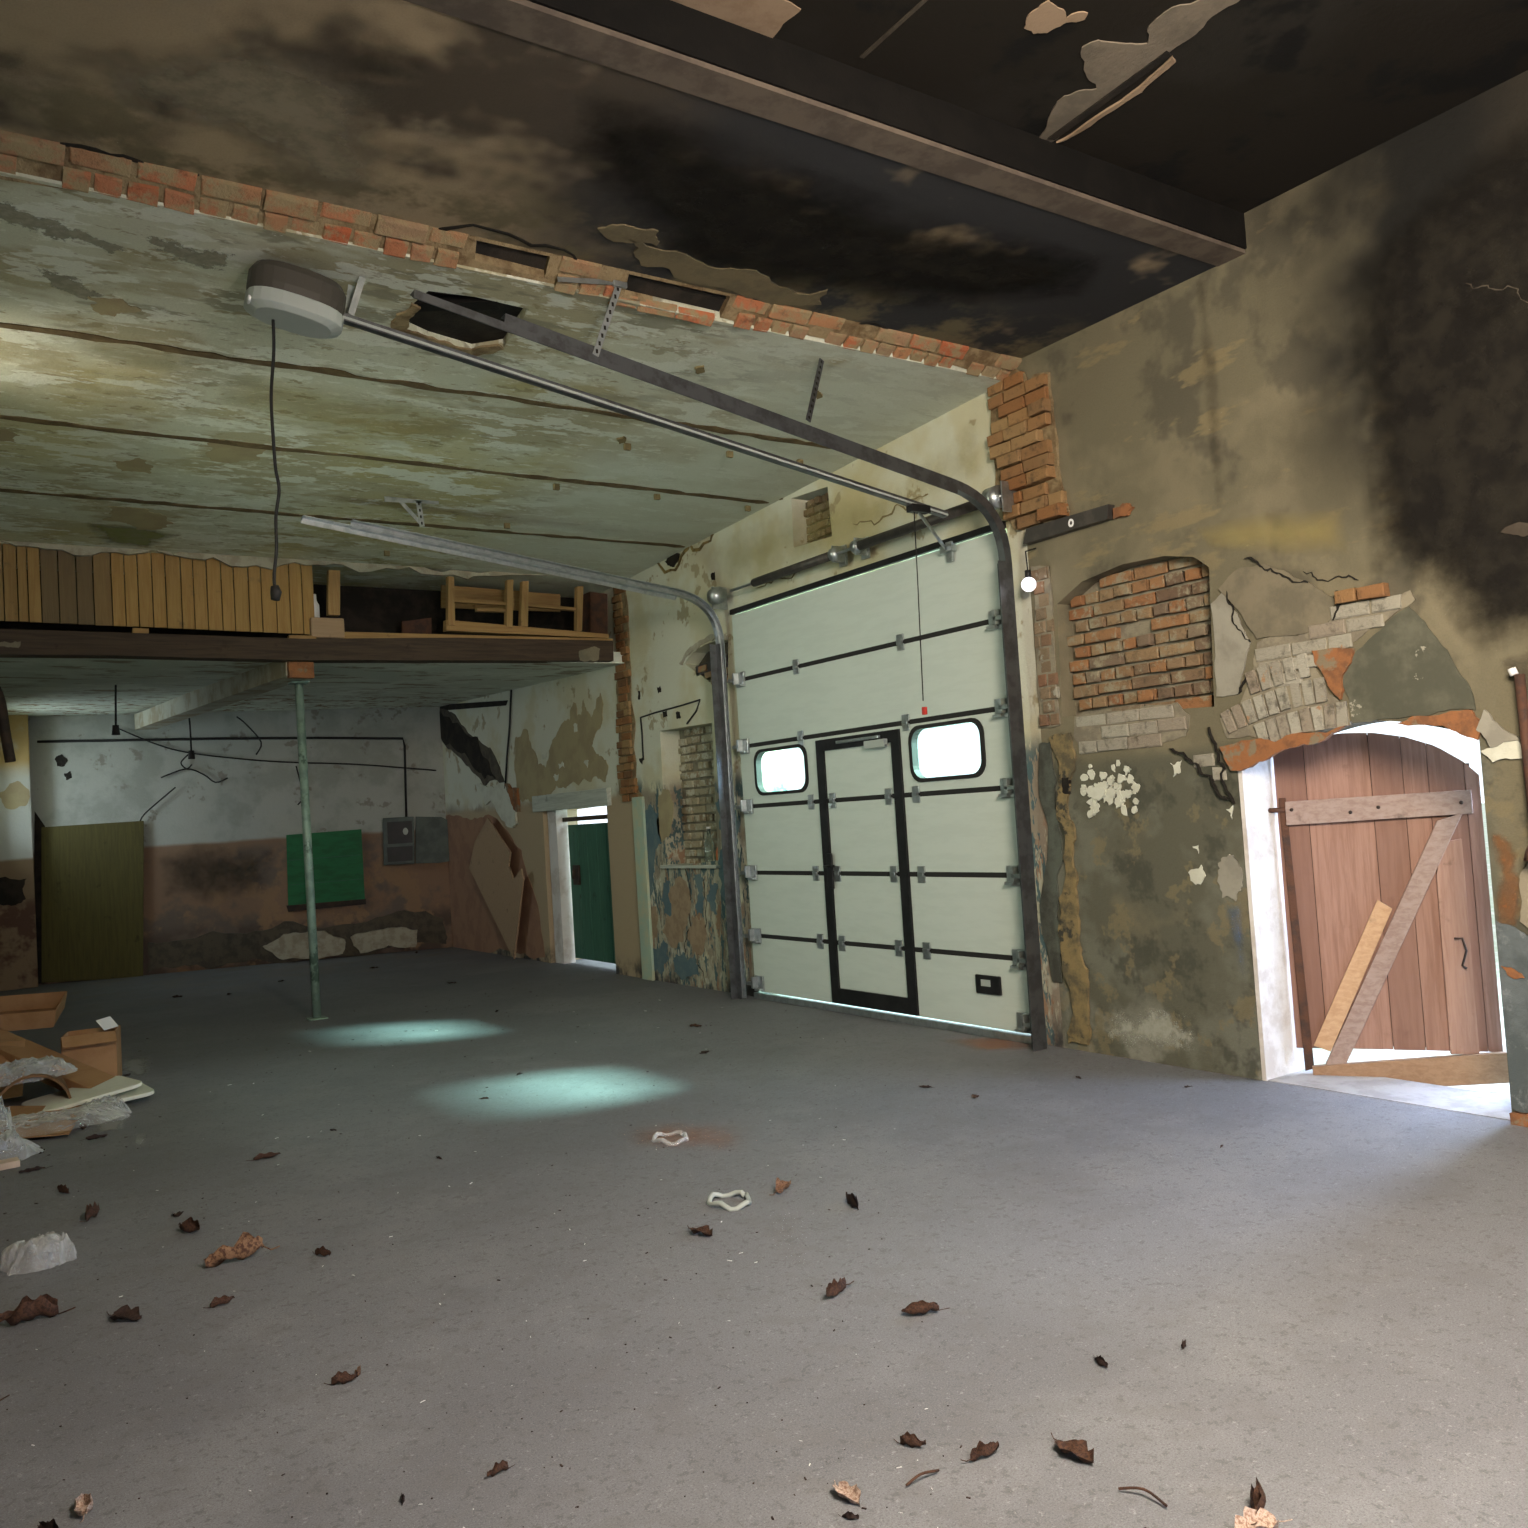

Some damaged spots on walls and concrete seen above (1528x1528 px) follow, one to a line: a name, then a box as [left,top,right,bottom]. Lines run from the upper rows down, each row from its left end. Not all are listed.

spalling [1024,0,1088,34]
spalling [1039,0,1240,143]
flaking render [0,130,469,270]
spalling [390,291,523,356]
flaking render [598,224,1069,530]
peeling [514,588,674,916]
spalling [1031,566,1190,1045]
crack [1169,727,1236,804]
crack [1226,591,1251,694]
flaking render [1171,583,1416,780]
crack [1244,557,1358,620]
peeling [1496,864,1528,1127]